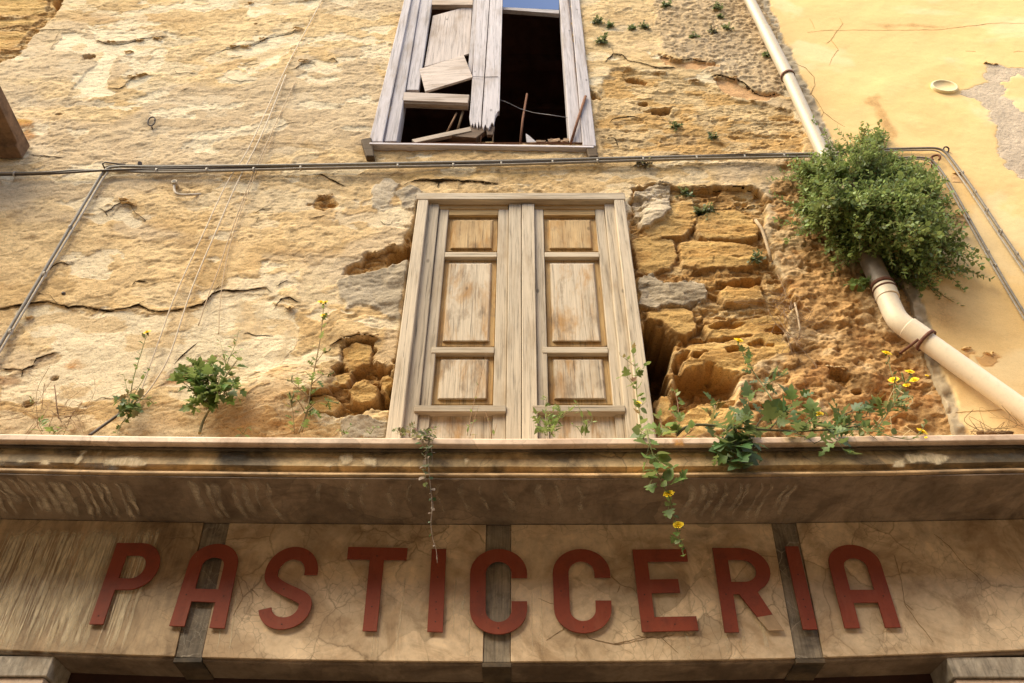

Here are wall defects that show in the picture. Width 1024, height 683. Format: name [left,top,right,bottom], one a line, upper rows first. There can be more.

spalling [0,0,64,63]
crack [605,47,780,97]
spalling [960,61,1024,179]
spalling [309,193,338,211]
crack [403,179,496,187]
spalling [342,230,413,276]
crack [2,262,301,312]
spalling [627,182,806,438]
spalling [308,331,395,418]
spalling [825,365,852,387]
crack [587,635,678,653]